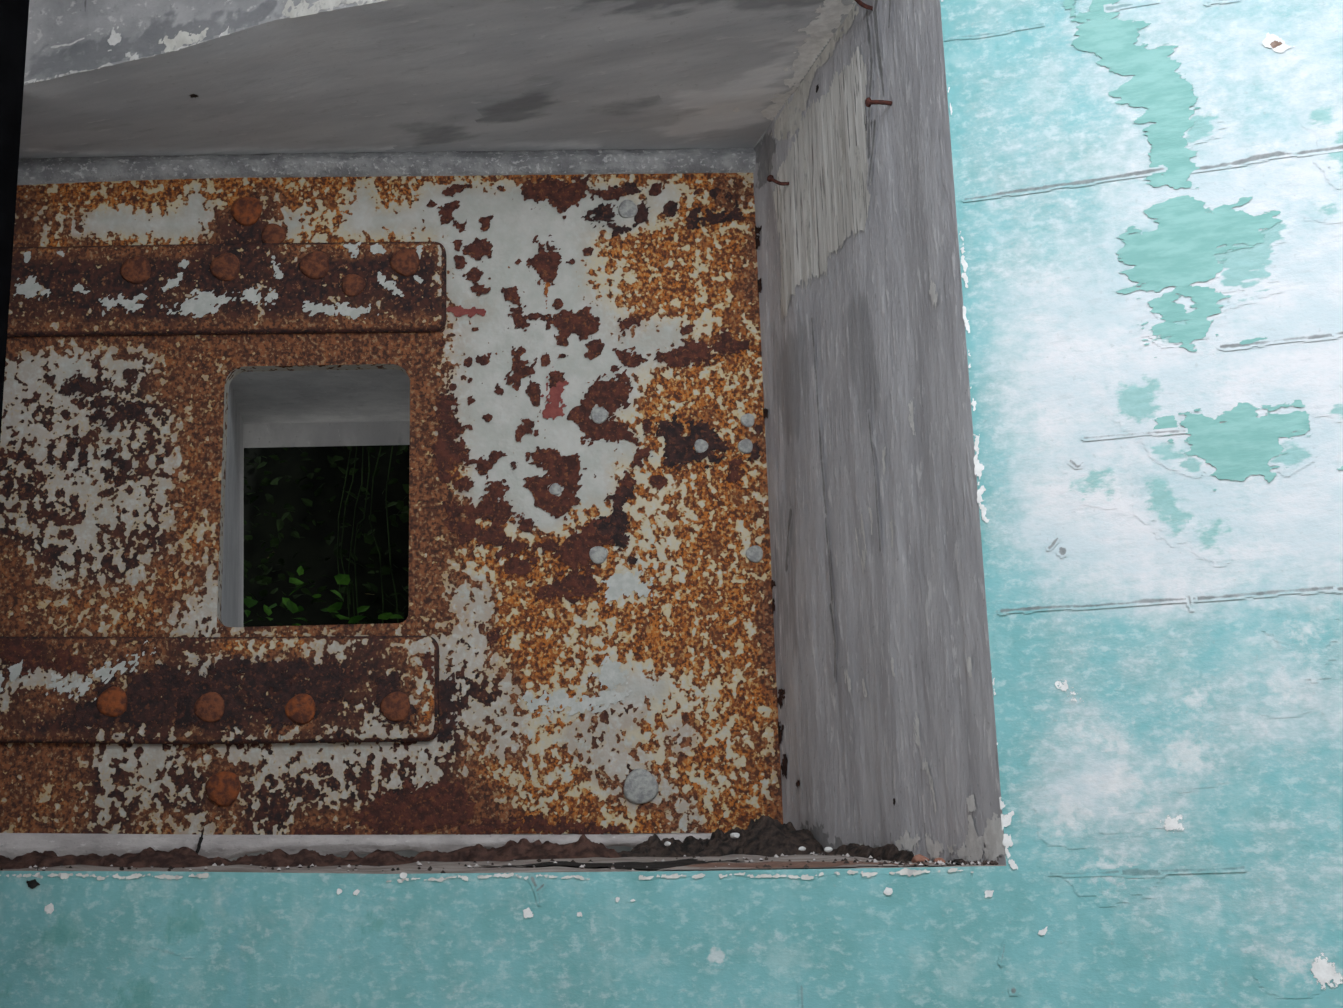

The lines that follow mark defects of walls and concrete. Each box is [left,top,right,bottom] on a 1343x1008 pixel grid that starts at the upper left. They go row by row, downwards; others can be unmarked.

peeling [282,0,387,18]
peeling [24,24,230,84]
crack [962,143,1343,202]
peeling [1063,0,1295,358]
spalling [959,231,968,288]
rust [426,174,764,606]
rust [45,368,154,488]
peeling [1142,399,1343,491]
rust [487,627,503,647]
rust [0,637,459,745]
rust [293,779,623,835]
damp [795,808,956,860]